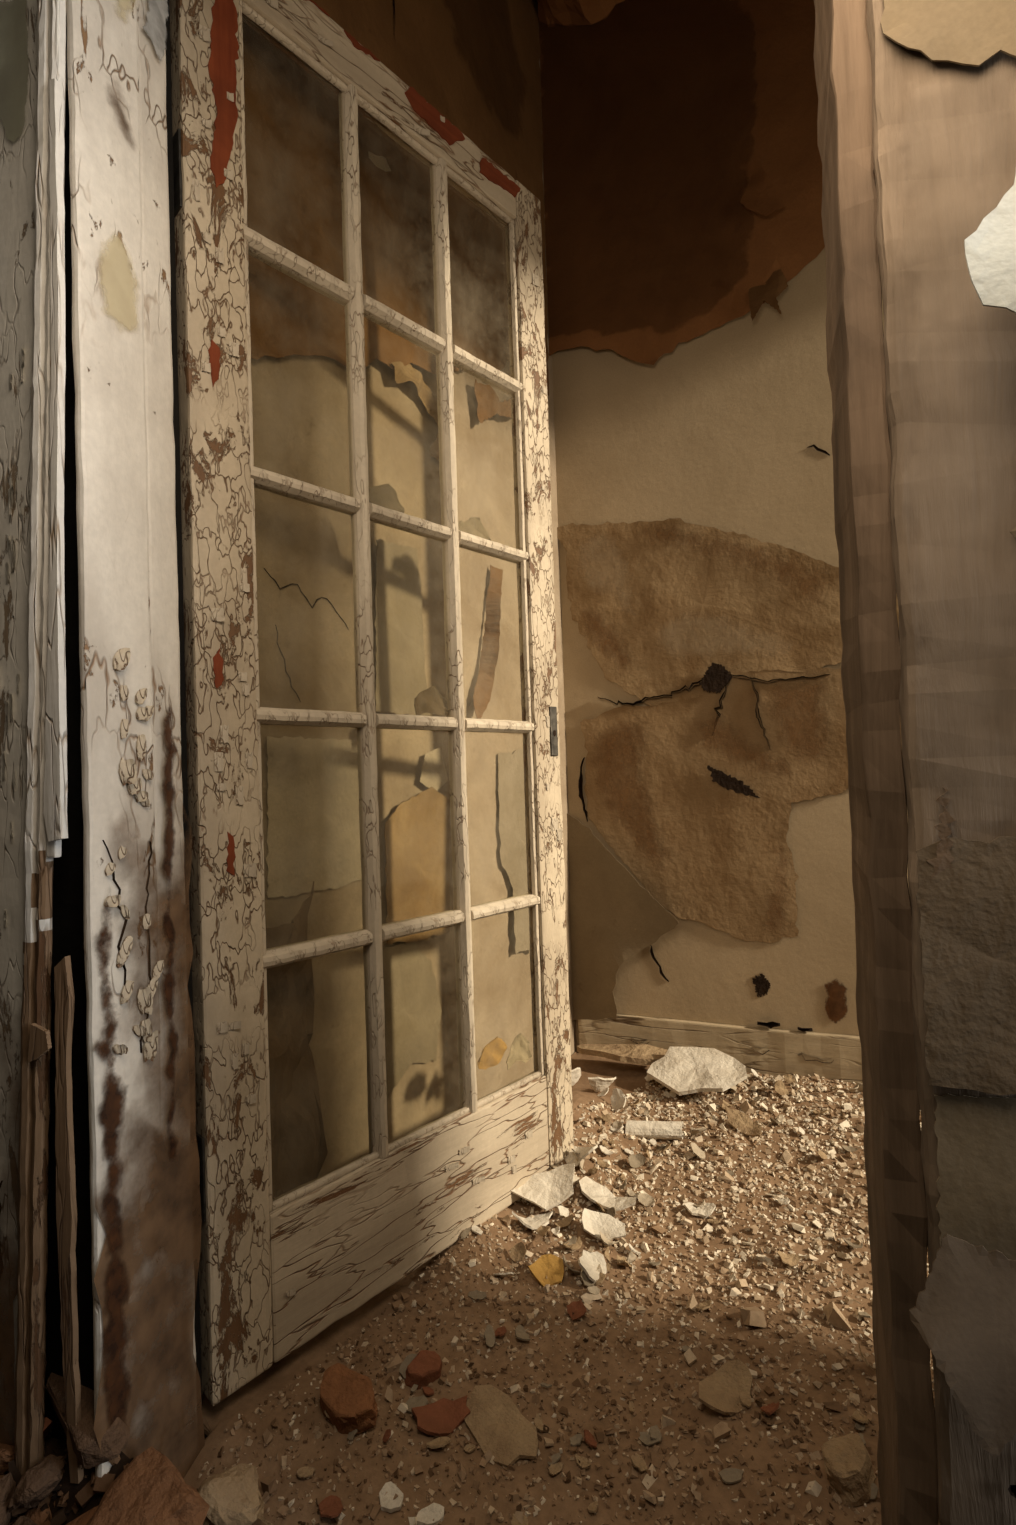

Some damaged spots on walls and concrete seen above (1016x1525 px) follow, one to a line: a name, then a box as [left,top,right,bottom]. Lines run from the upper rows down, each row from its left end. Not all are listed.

peeling [748,269,788,321]
spalling [699,663,732,694]
spalling [707,765,760,798]